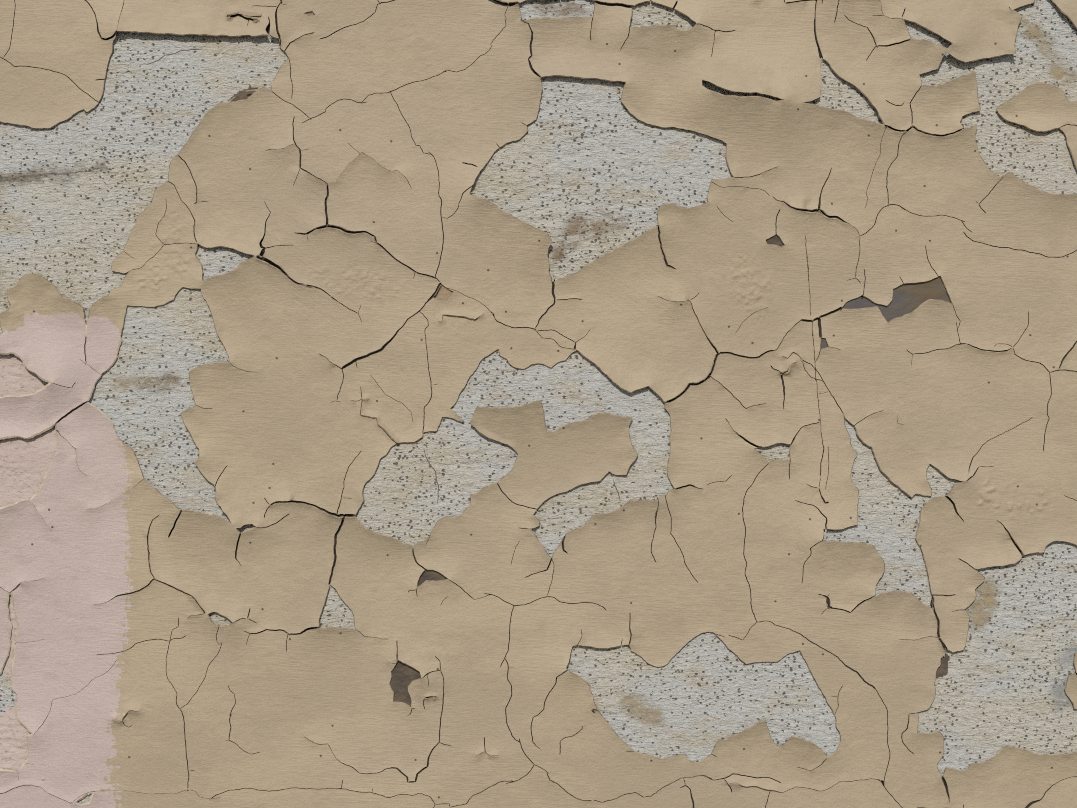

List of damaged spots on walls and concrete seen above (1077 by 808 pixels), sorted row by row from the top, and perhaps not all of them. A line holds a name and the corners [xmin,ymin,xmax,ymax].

peeling [0,9,290,551]
crack [227,0,589,504]
crack [590,0,677,39]
peeling [442,0,908,289]
peeling [880,0,1077,215]
crack [42,510,317,792]
crack [235,451,361,584]
peeling [346,347,683,565]
crack [212,483,837,808]
peeling [543,632,840,770]
crack [651,88,1077,808]
peeling [912,535,1077,784]